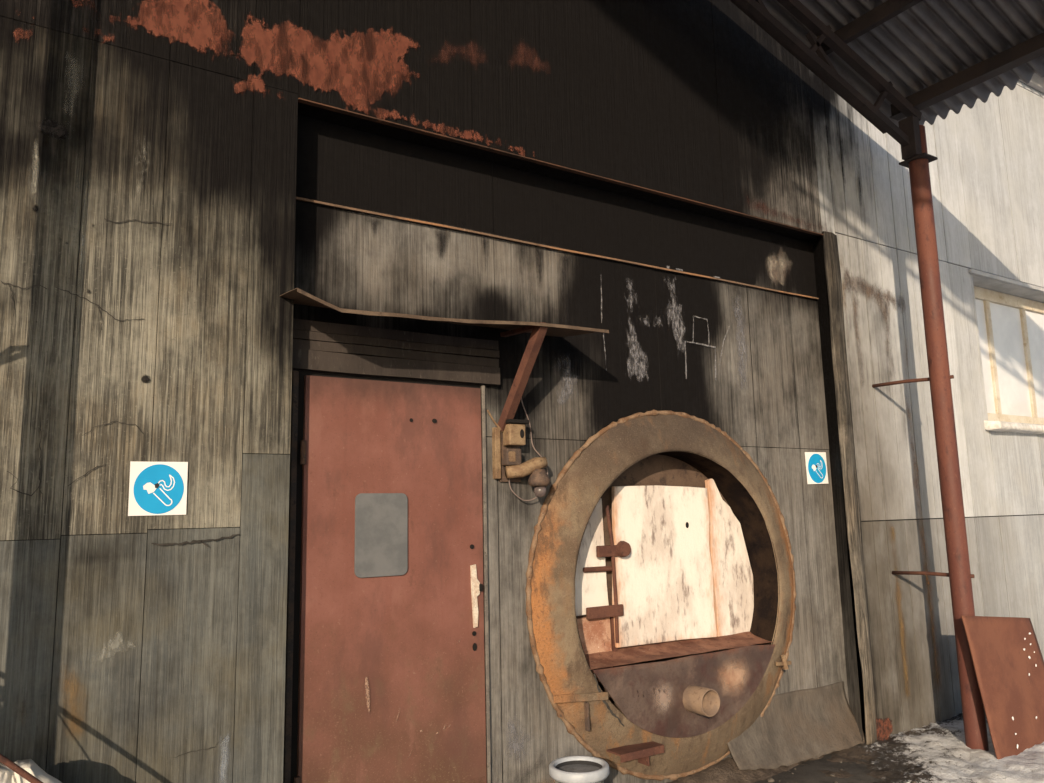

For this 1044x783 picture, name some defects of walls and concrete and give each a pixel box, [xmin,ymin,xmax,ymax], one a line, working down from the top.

rust [345,97,524,156]
water stain [437,230,447,256]
crack [1,281,141,334]
crack [151,534,240,547]